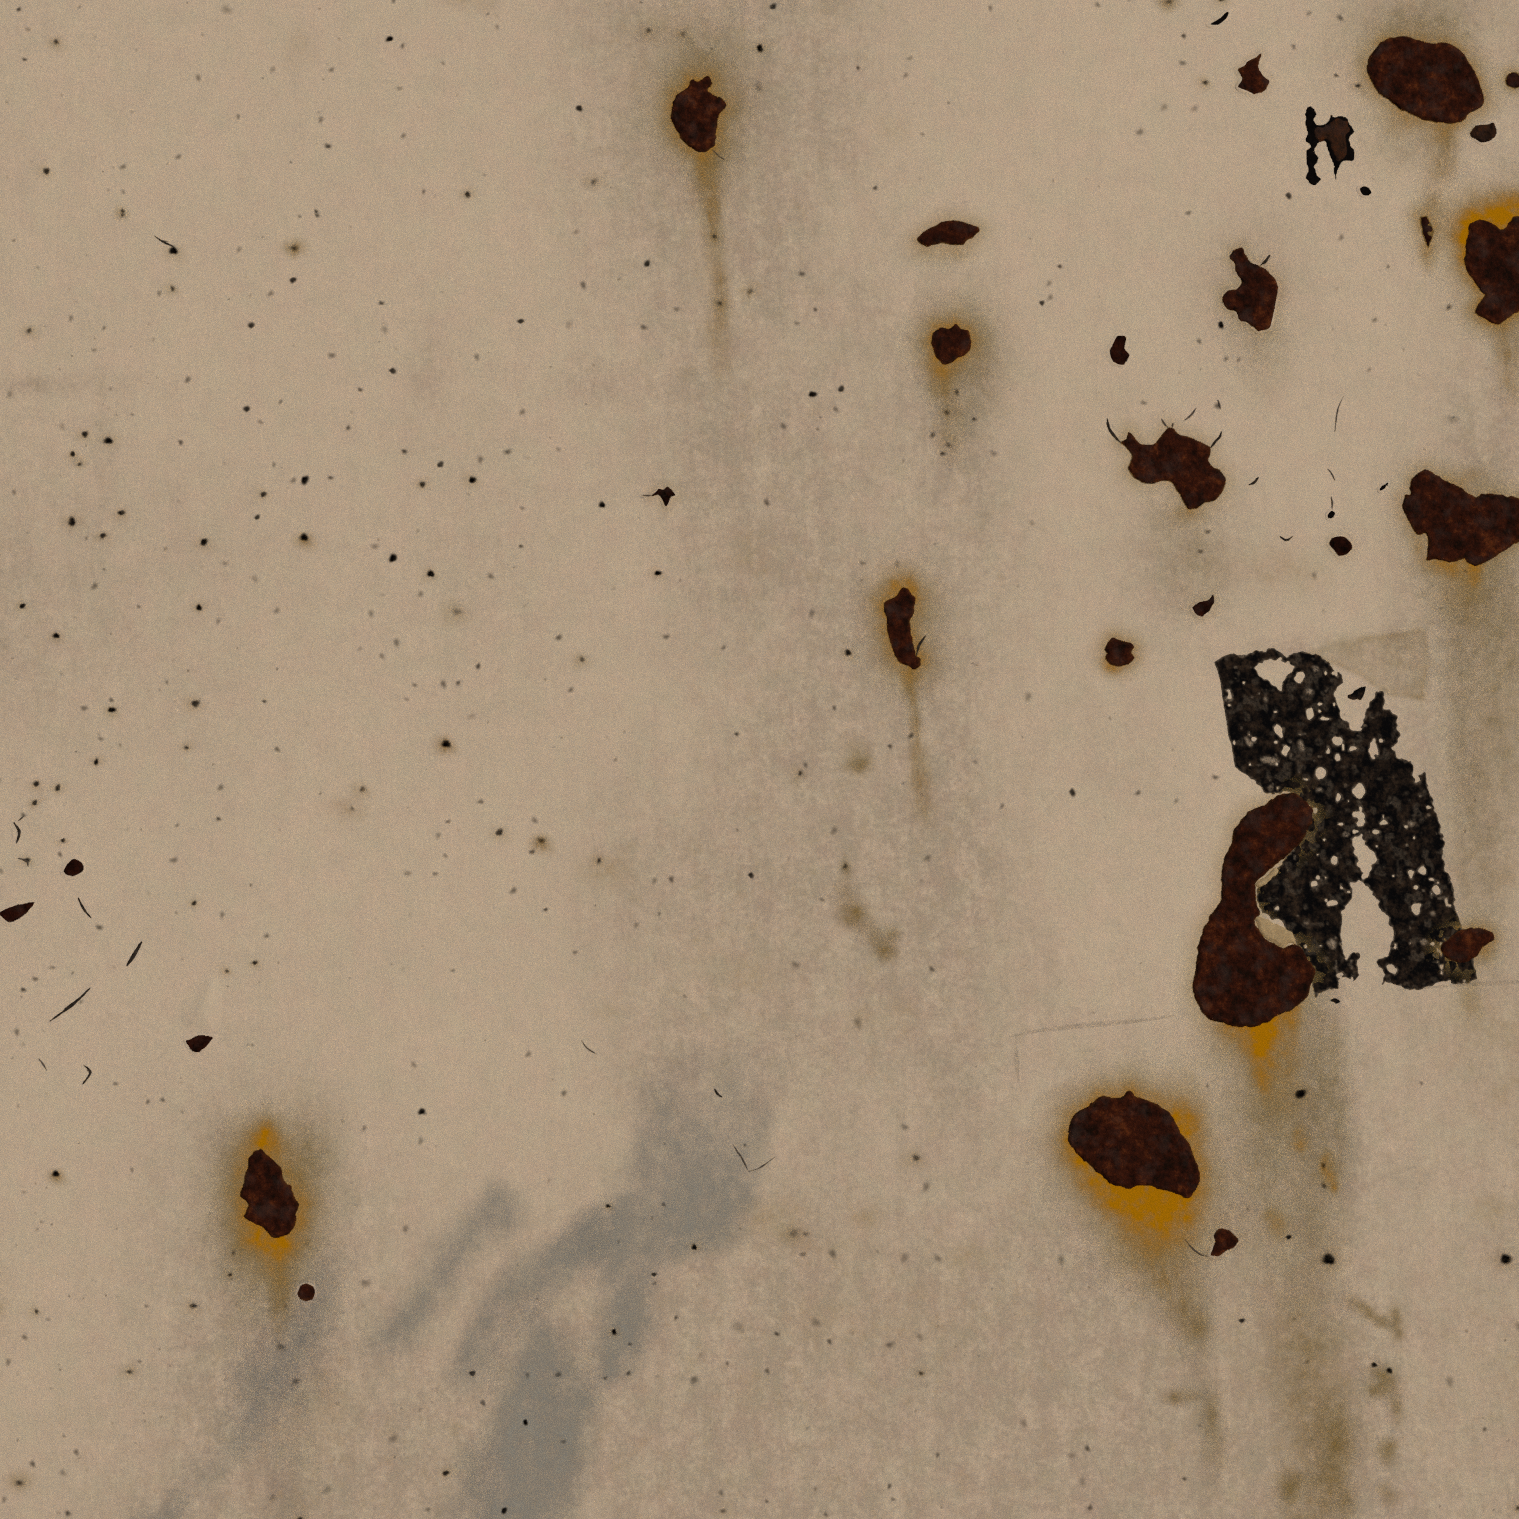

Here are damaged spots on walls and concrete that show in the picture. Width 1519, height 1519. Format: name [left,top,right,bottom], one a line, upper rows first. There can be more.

corrosion [1356,20,1484,136]
corrosion [667,55,728,237]
corrosion [917,220,980,247]
corrosion [1219,244,1281,334]
corrosion [1450,191,1519,327]
corrosion [1107,418,1226,513]
corrosion [1402,469,1519,587]
corrosion [877,576,927,695]
peeling [1348,686,1366,700]
corrosion [1192,793,1316,1095]
corrosion [224,1121,317,1287]
corrosion [1059,1082,1209,1289]